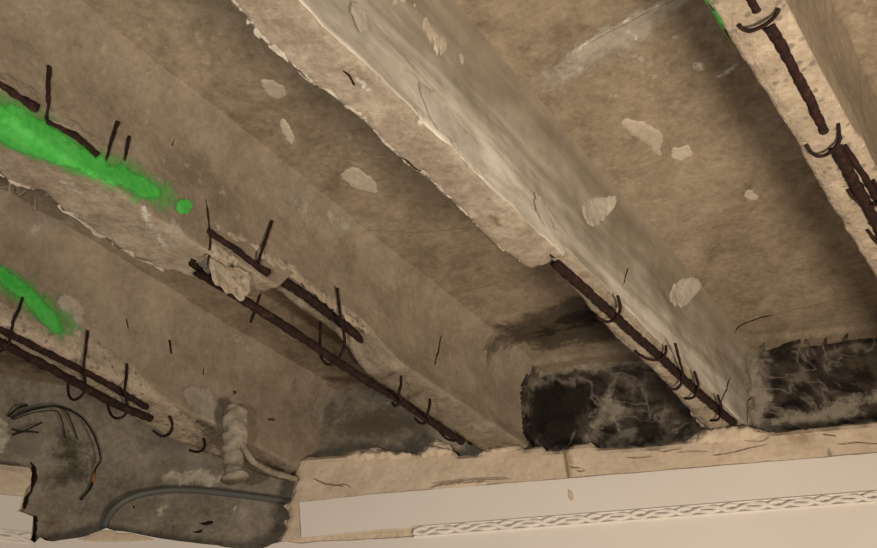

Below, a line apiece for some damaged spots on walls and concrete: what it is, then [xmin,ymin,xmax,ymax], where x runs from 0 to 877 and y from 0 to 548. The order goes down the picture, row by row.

spalling [231,0,485,234]
spalling [58,205,164,271]
peeling [583,195,617,227]
spalling [0,293,220,454]
leakage [486,297,617,356]
leakage [520,366,693,449]
spalling [550,259,738,429]
leakage [754,333,877,431]
peeling [78,530,154,542]